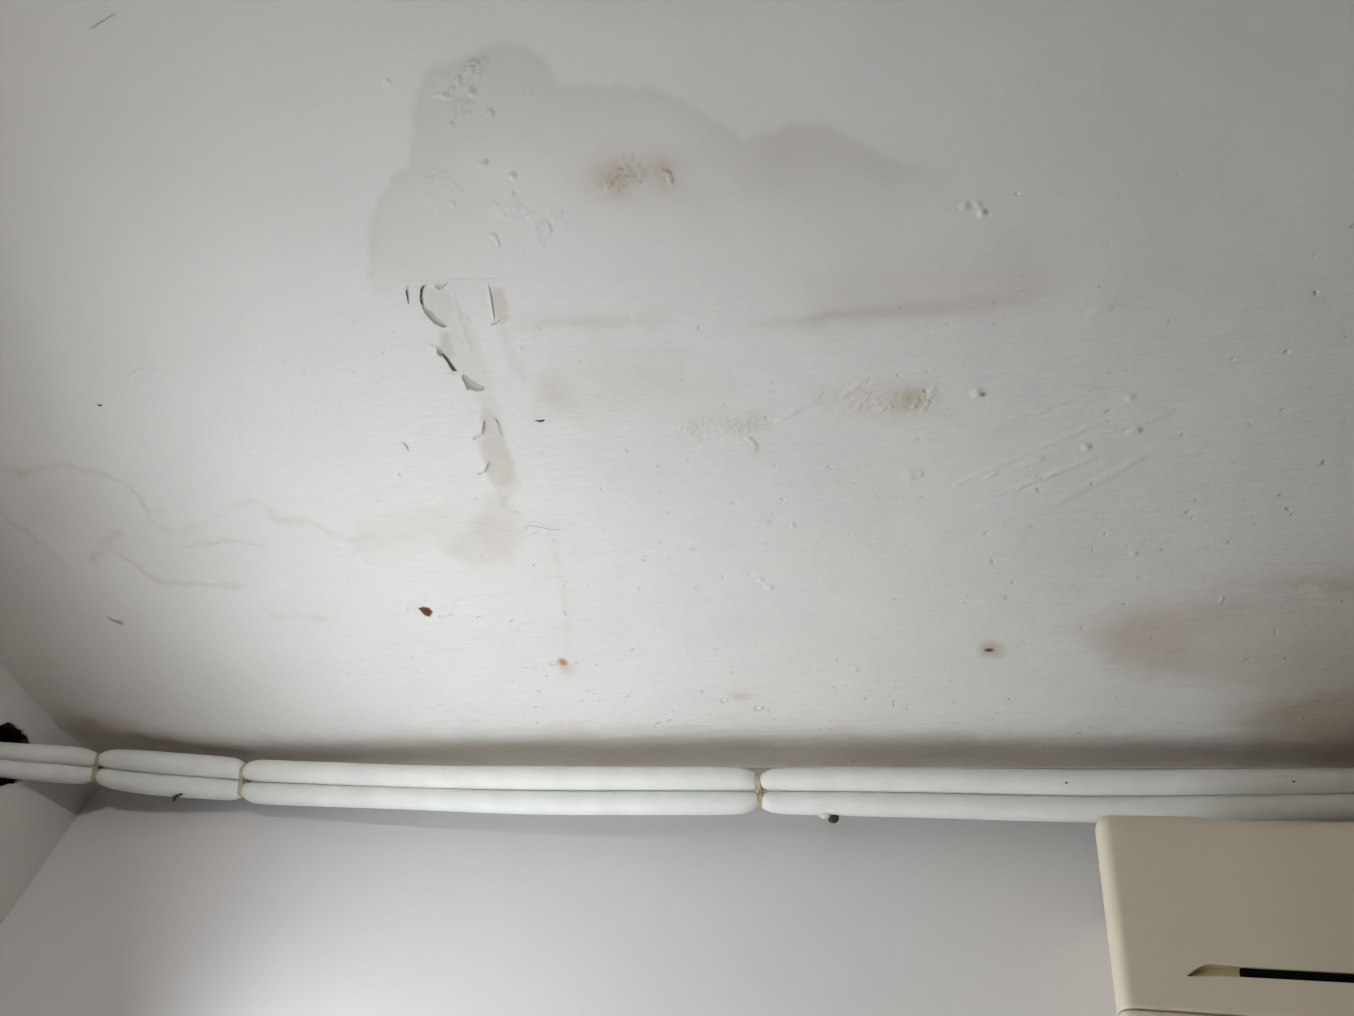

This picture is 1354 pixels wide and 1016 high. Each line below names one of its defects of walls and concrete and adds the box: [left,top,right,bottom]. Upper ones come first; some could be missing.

leakage [361,36,1078,436]
peeling [393,277,528,499]
leakage [0,460,577,658]
rust [417,605,434,618]
rust [553,656,581,680]
leakage [35,557,1354,767]
rust [973,638,1009,661]